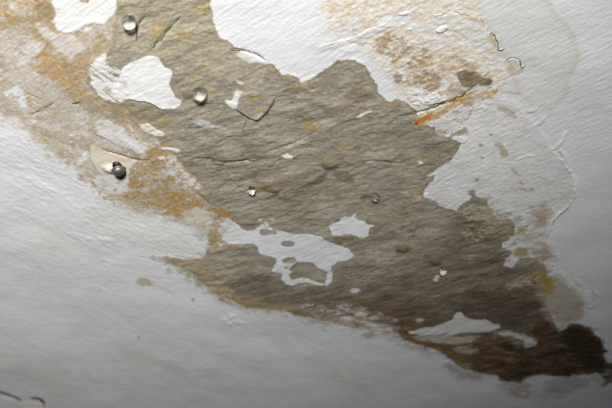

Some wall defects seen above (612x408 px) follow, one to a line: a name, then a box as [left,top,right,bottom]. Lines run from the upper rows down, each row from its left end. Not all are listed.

crack [433,12,526,68]
water stain [0,28,191,231]
peeling [89,117,165,196]
peeling [87,52,183,111]
peeling [157,147,204,192]
crack [206,94,285,131]
water stain [84,0,601,358]
rust [409,86,500,131]
peeling [422,95,578,241]
peeling [180,205,375,287]
peeling [407,311,539,356]
water stain [493,319,612,402]